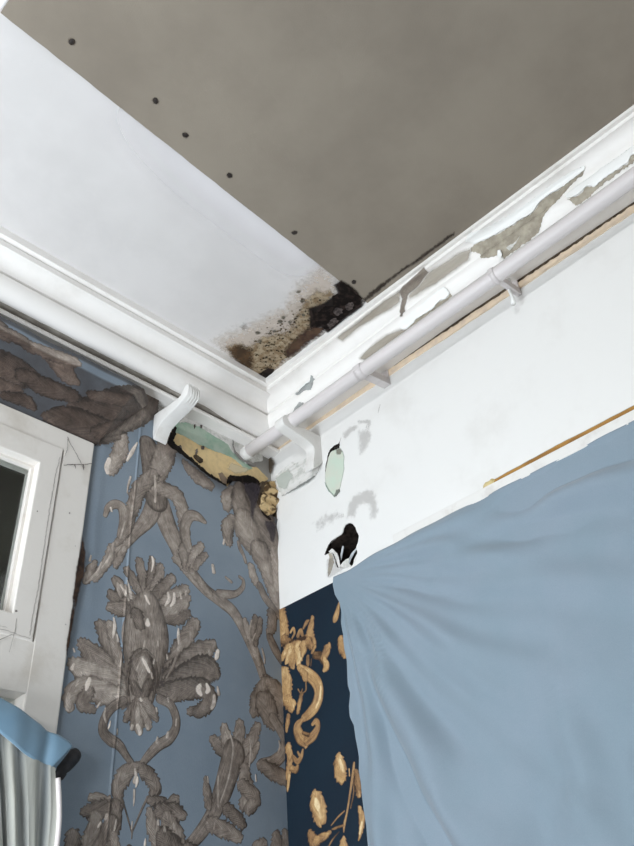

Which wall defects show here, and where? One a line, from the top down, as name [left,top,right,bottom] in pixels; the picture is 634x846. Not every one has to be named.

peeling [465,145,634,259]
flaking render [517,202,634,289]
water stain [226,290,333,378]
spalling [308,281,363,332]
flaking render [388,287,510,376]
peeling [294,375,315,411]
flaking render [167,417,268,486]
peeling [325,439,344,497]
spalling [324,523,359,577]